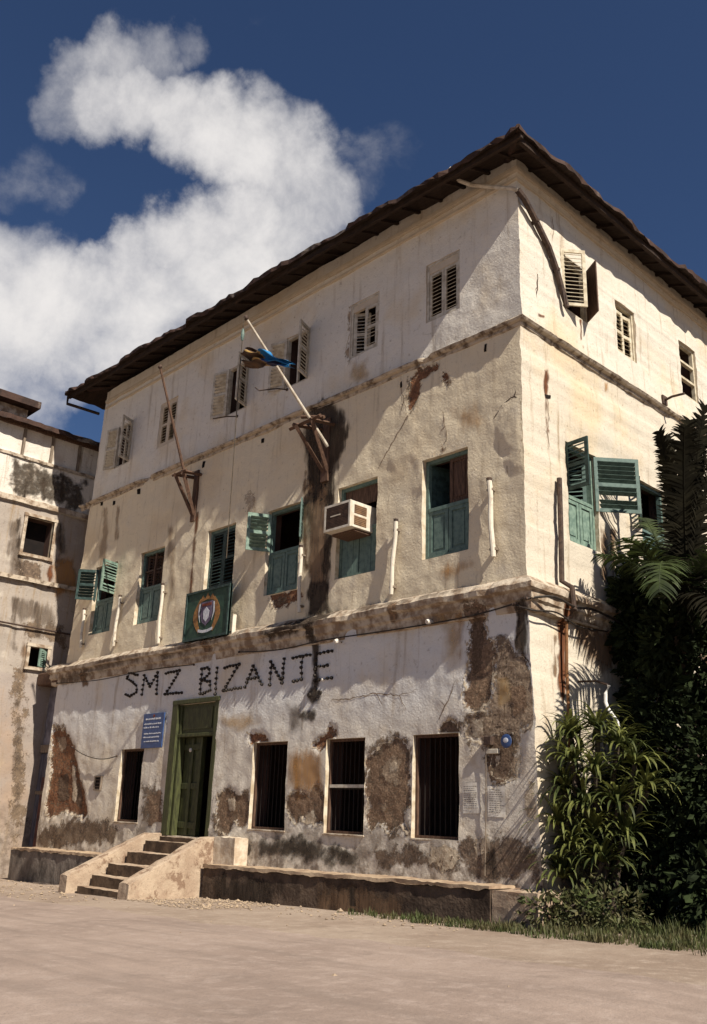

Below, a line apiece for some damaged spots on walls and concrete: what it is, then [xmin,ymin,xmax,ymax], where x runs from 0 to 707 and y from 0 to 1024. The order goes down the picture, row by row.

flaking render [400,362,451,417]
damp [11,458,87,511]
damp [255,398,348,726]
flaking render [438,599,535,790]
flaking render [44,723,87,822]
flaking render [212,787,249,837]
flaking render [285,784,325,827]
flaking render [364,731,413,840]